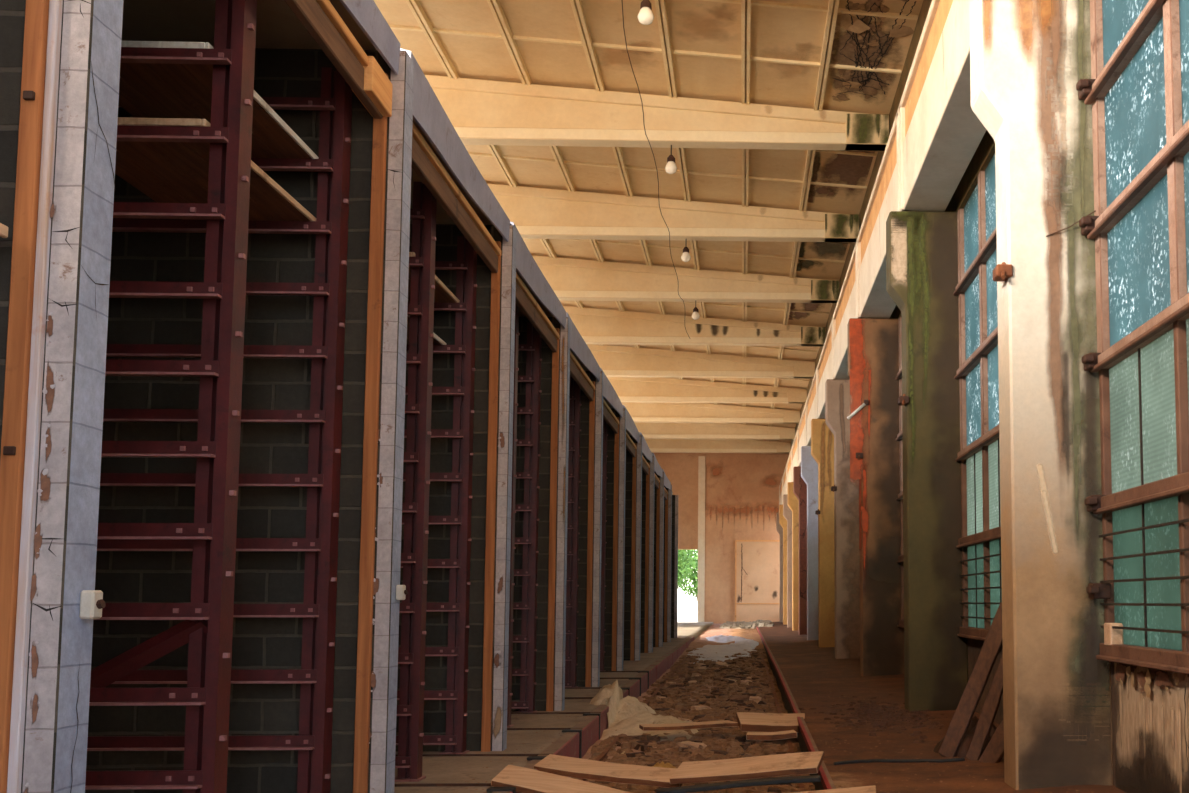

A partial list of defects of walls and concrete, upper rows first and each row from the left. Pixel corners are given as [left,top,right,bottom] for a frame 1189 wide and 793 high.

peeling [826,0,914,101]
water stain [839,217,967,711]
water stain [1037,0,1099,583]
water stain [1018,599,1189,793]